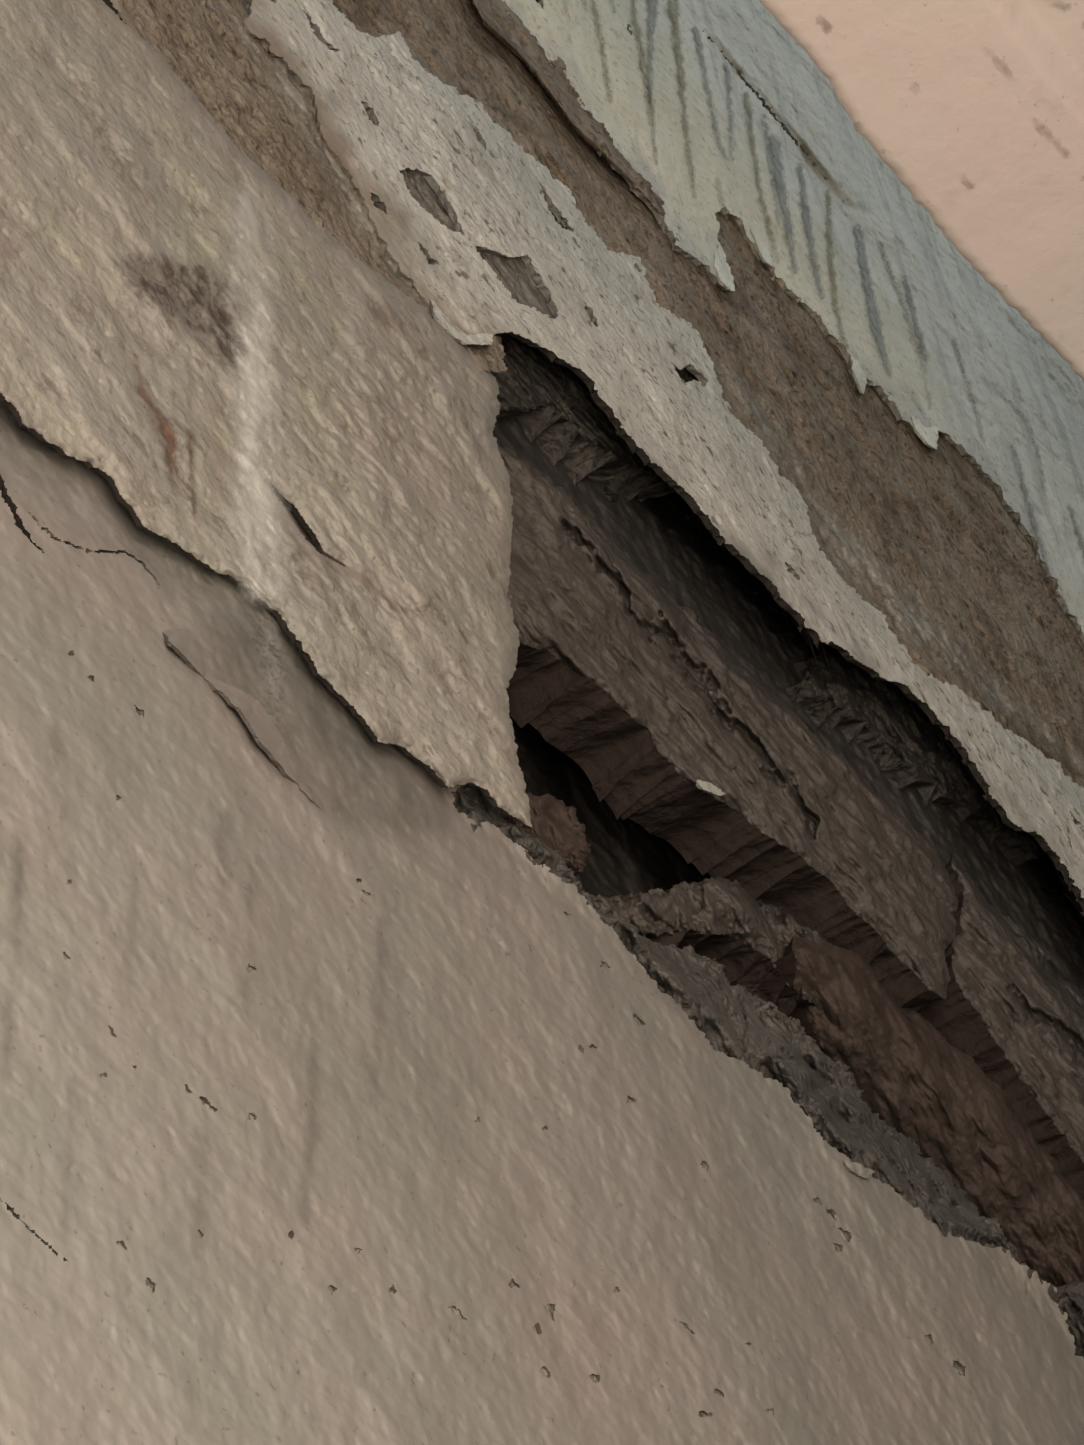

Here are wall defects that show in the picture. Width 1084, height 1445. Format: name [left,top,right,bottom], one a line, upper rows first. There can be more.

flaking render [117,0,422,305]
leakage [592,0,611,97]
flaking render [333,0,1084,787]
leakage [632,0,848,347]
leakage [854,225,926,375]
crack [94,548,119,556]
flaking render [162,629,324,811]
spalling [426,299,1084,1358]